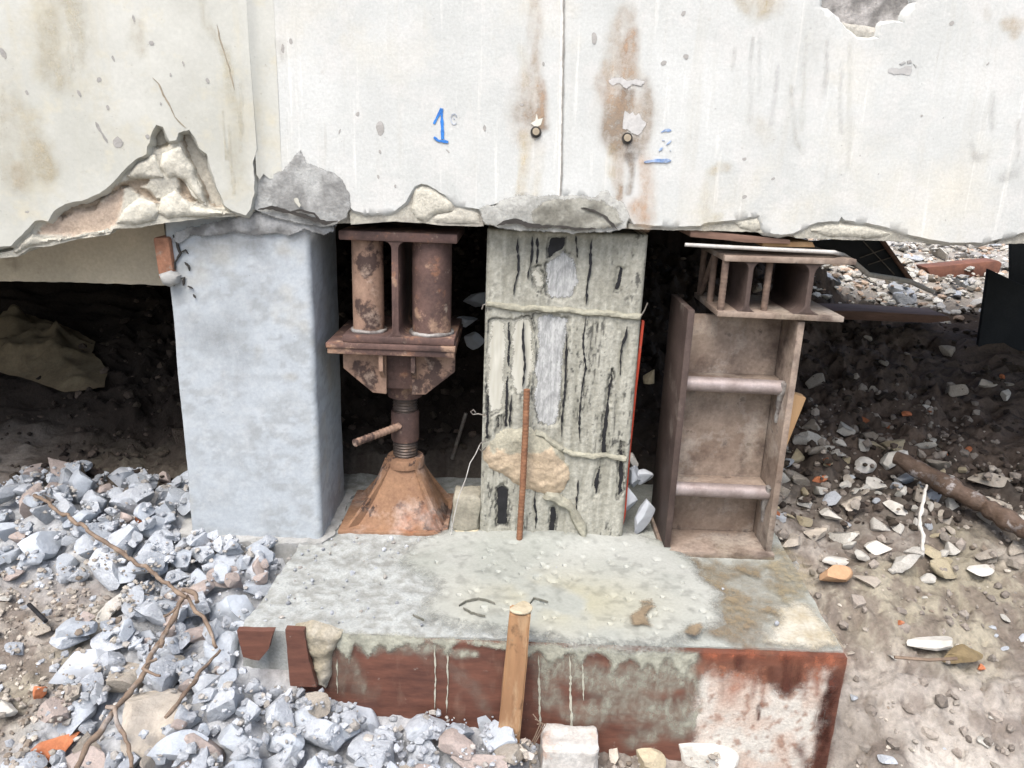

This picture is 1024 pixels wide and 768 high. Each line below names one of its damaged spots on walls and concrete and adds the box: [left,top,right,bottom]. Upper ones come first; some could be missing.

spalling [821,0,908,38]
rust [523,84,546,130]
rust [603,30,651,173]
spalling [0,135,240,278]
spalling [349,185,484,227]
crack [497,0,628,530]
crack [485,322,526,438]